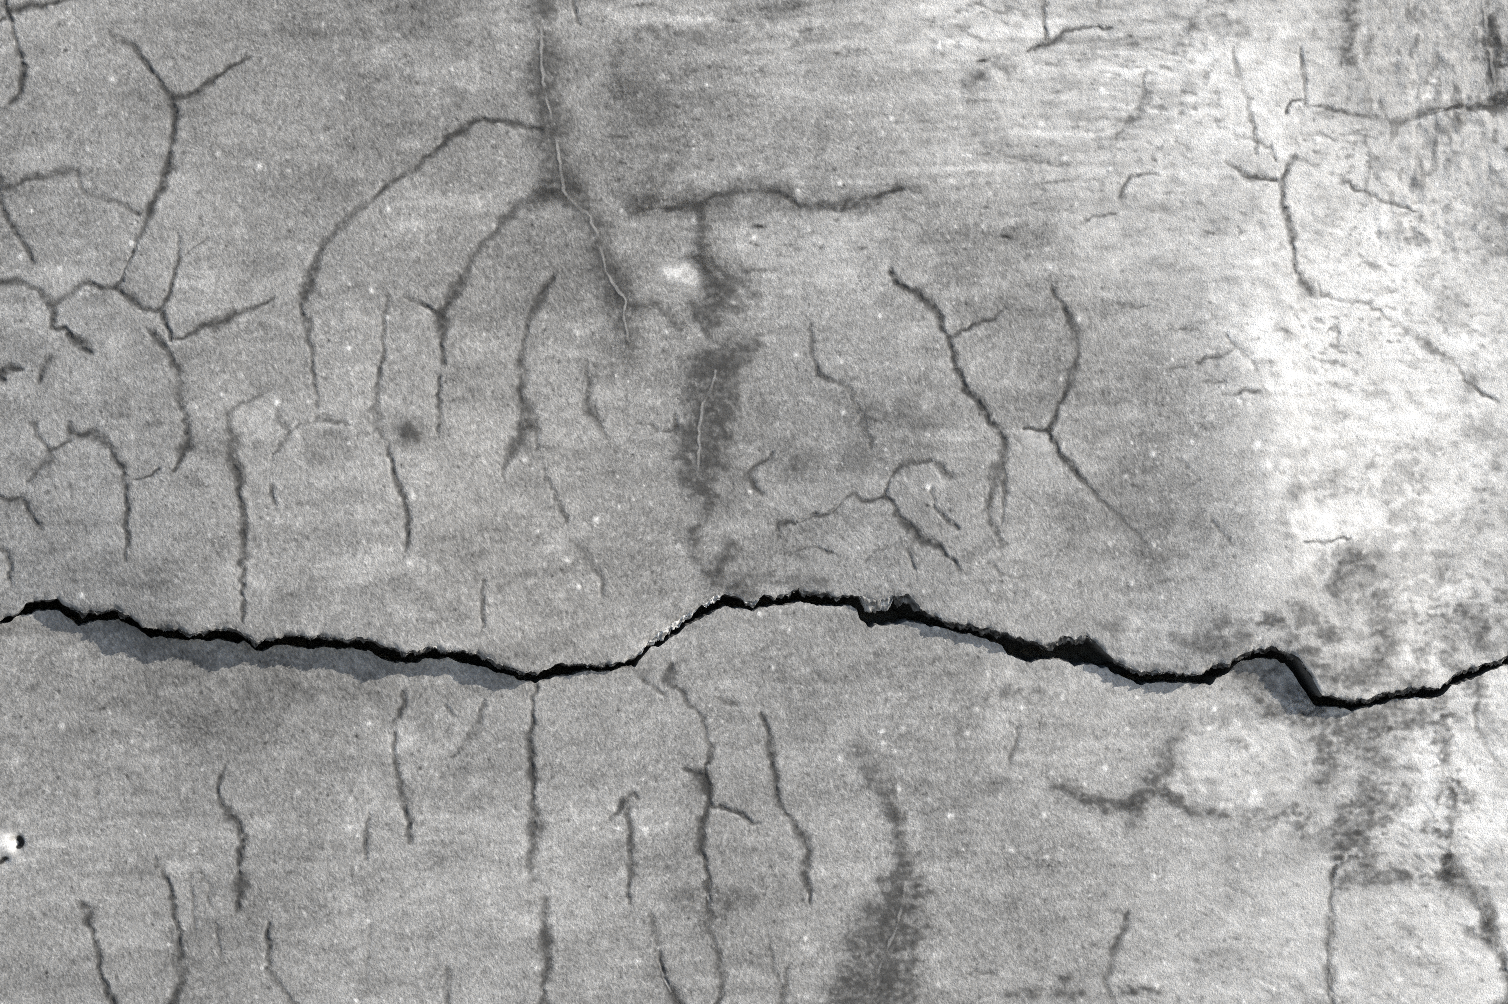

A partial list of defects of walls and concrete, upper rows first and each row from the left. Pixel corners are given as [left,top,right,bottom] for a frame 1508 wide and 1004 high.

crack [0,0,65,104]
crack [1030,1,1109,49]
crack [0,45,541,554]
leakage [675,343,759,510]
leakage [681,196,757,332]
crack [888,270,1108,507]
crack [1235,54,1358,290]
crack [0,430,1508,858]
crack [81,903,116,1004]
crack [216,775,271,959]
crack [683,714,811,907]
leakage [829,802,923,1004]